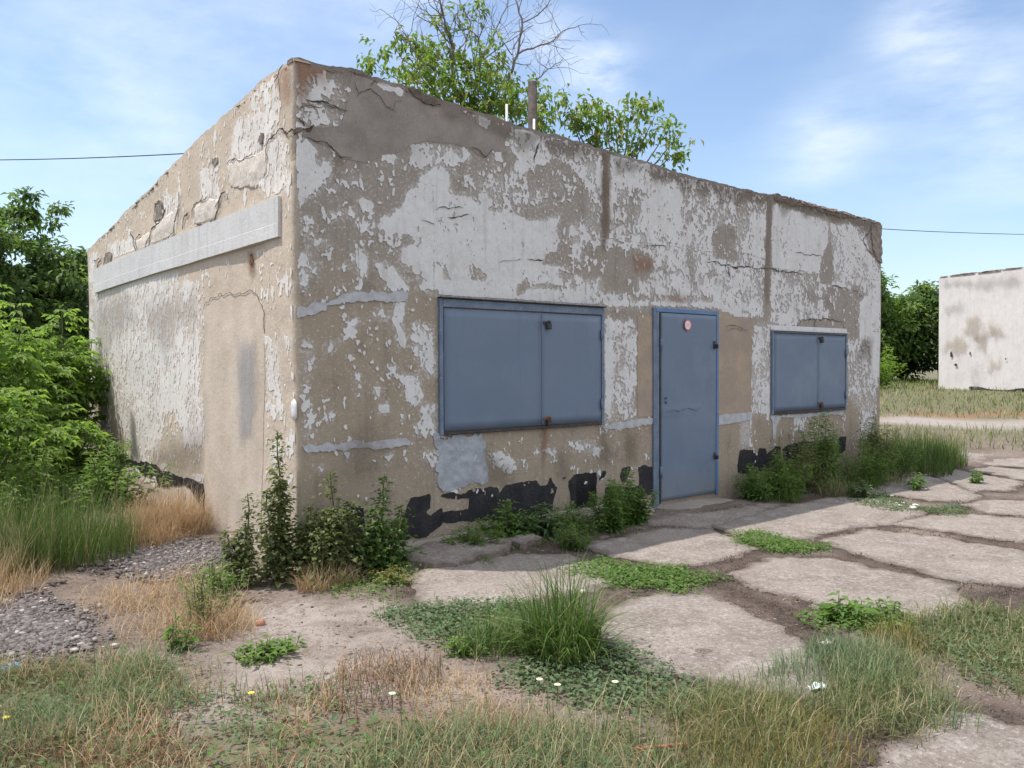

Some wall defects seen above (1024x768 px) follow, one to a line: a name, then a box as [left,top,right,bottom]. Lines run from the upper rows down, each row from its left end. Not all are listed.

crack [226,66,397,164]
crack [203,290,264,328]
peeling [88,70,883,509]
crack [708,252,818,279]